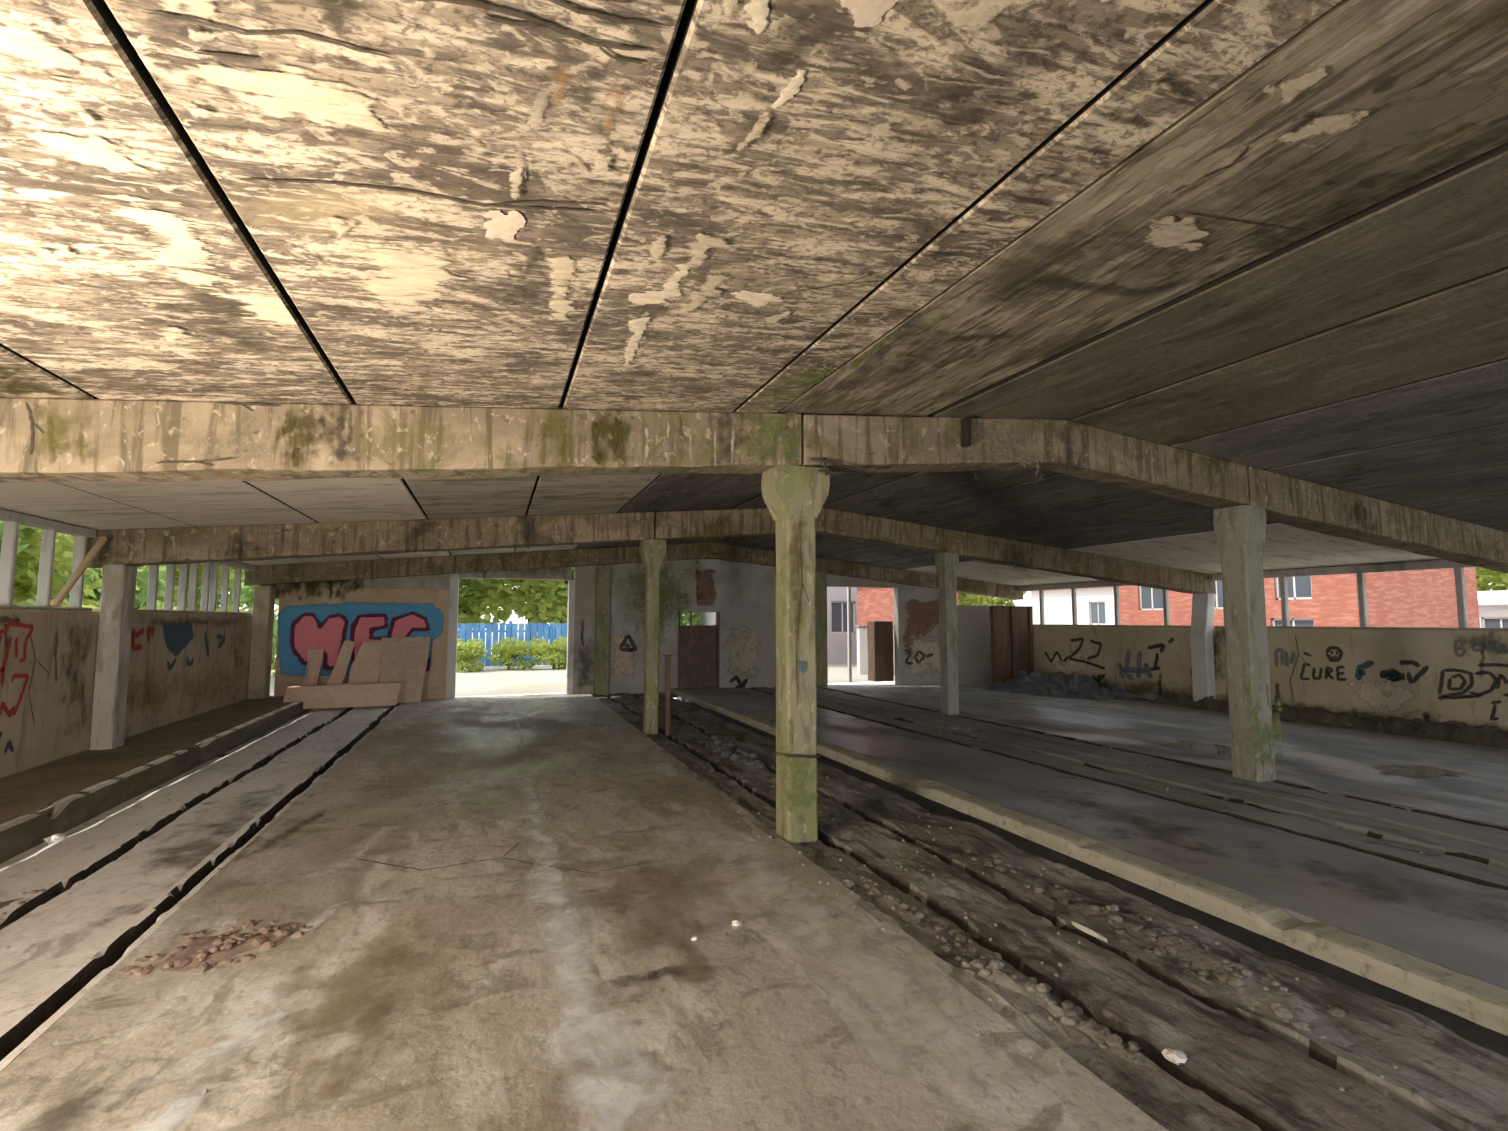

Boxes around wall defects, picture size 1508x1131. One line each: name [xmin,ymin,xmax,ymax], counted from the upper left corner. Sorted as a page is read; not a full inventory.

peeling [836,0,899,28]
peeling [1264,64,1327,104]
peeling [729,70,806,157]
peeling [1277,110,1369,146]
peeling [482,168,526,241]
leakage [959,198,1054,235]
peeling [1145,216,1210,251]
leakage [993,232,1189,301]
peeling [622,233,791,371]
leakage [592,418,620,461]
leakage [645,421,692,460]
leakage [714,410,764,462]